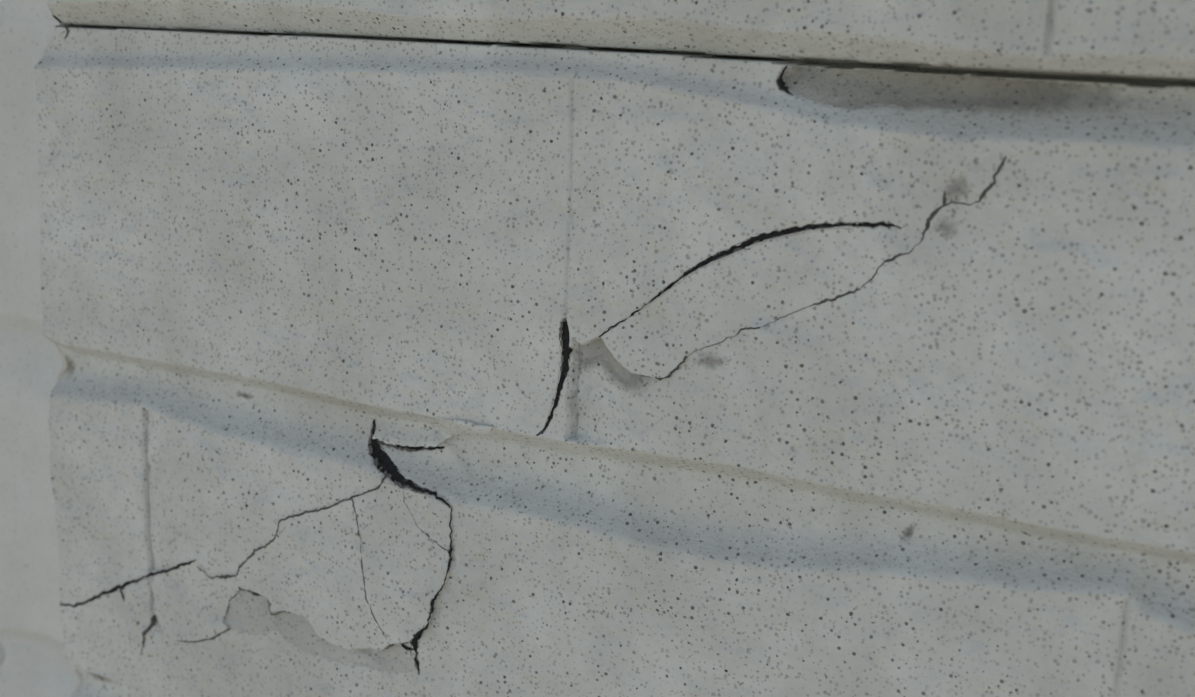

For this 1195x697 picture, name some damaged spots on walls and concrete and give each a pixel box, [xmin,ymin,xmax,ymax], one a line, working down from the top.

crack [536,322,573,436]
crack [599,156,1006,381]
crack [60,420,453,675]